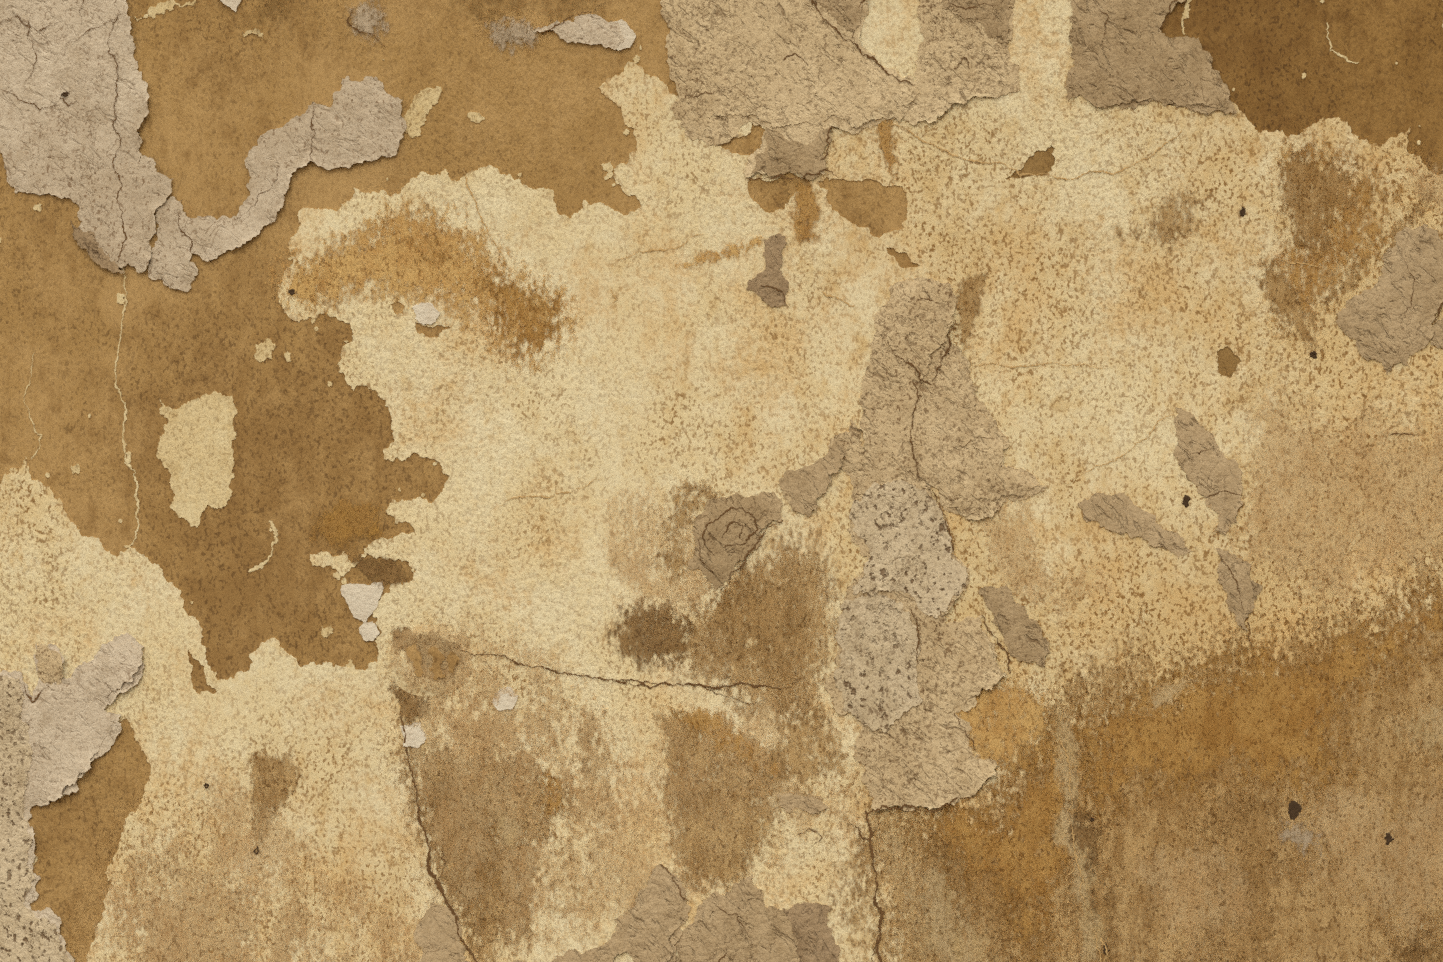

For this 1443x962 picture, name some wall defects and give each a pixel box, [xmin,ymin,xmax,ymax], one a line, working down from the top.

peeling [1065,0,1443,176]
peeling [1336,224,1443,374]
peeling [0,0,1055,814]
peeling [1078,492,1191,558]
peeling [1173,407,1262,643]
peeling [0,632,151,962]
crack [400,713,477,962]
peeling [414,899,470,962]
crack [453,647,791,704]
peeling [552,864,840,962]
damp [841,546,1443,962]